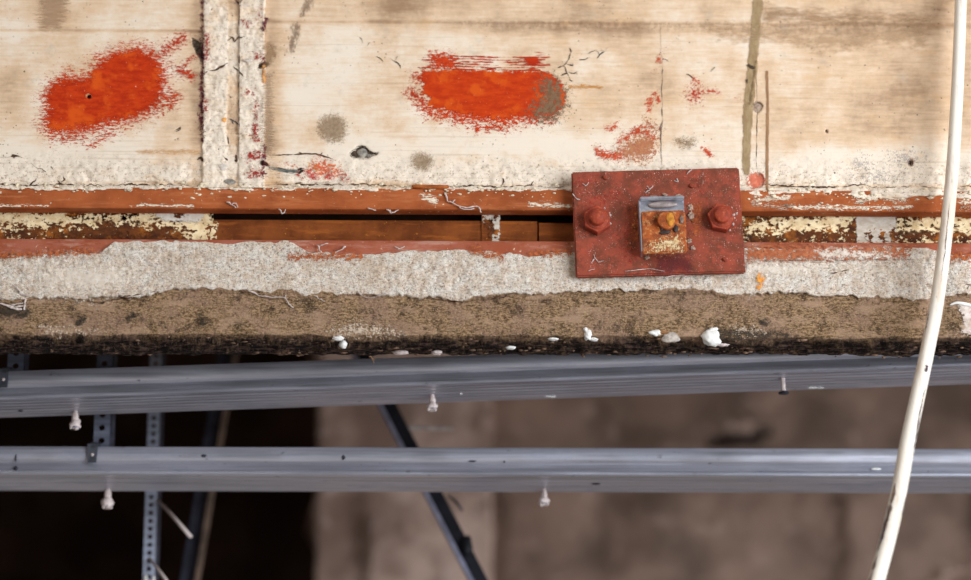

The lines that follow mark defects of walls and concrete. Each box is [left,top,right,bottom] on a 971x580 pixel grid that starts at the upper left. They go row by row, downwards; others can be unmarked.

water stain [742,0,925,212]
peeling [0,213,219,240]
peeling [742,216,857,243]
peeling [895,217,941,243]
peeling [952,217,971,243]